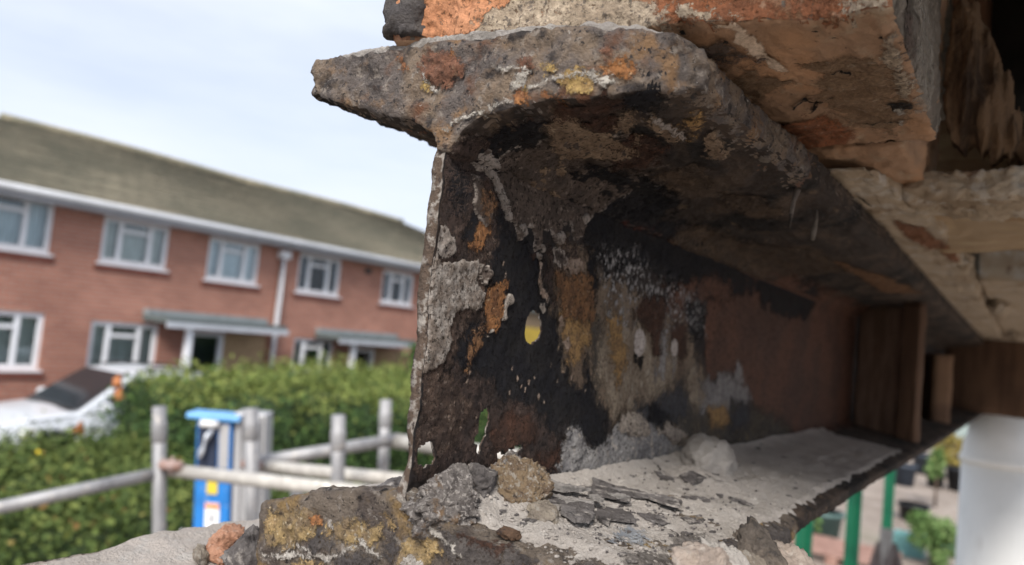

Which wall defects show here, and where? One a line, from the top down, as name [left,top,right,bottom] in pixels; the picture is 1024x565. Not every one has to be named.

spalling [653,0,854,39]
corrosion [395,47,466,94]
corrosion [508,45,674,172]
peeling [649,109,730,161]
peeling [473,153,529,237]
peeling [436,225,457,259]
corrosion [412,132,710,526]
peeling [376,476,402,487]
peeling [192,523,259,565]
peeling [487,492,537,525]
peeling [558,468,757,565]
corrosion [763,521,792,544]